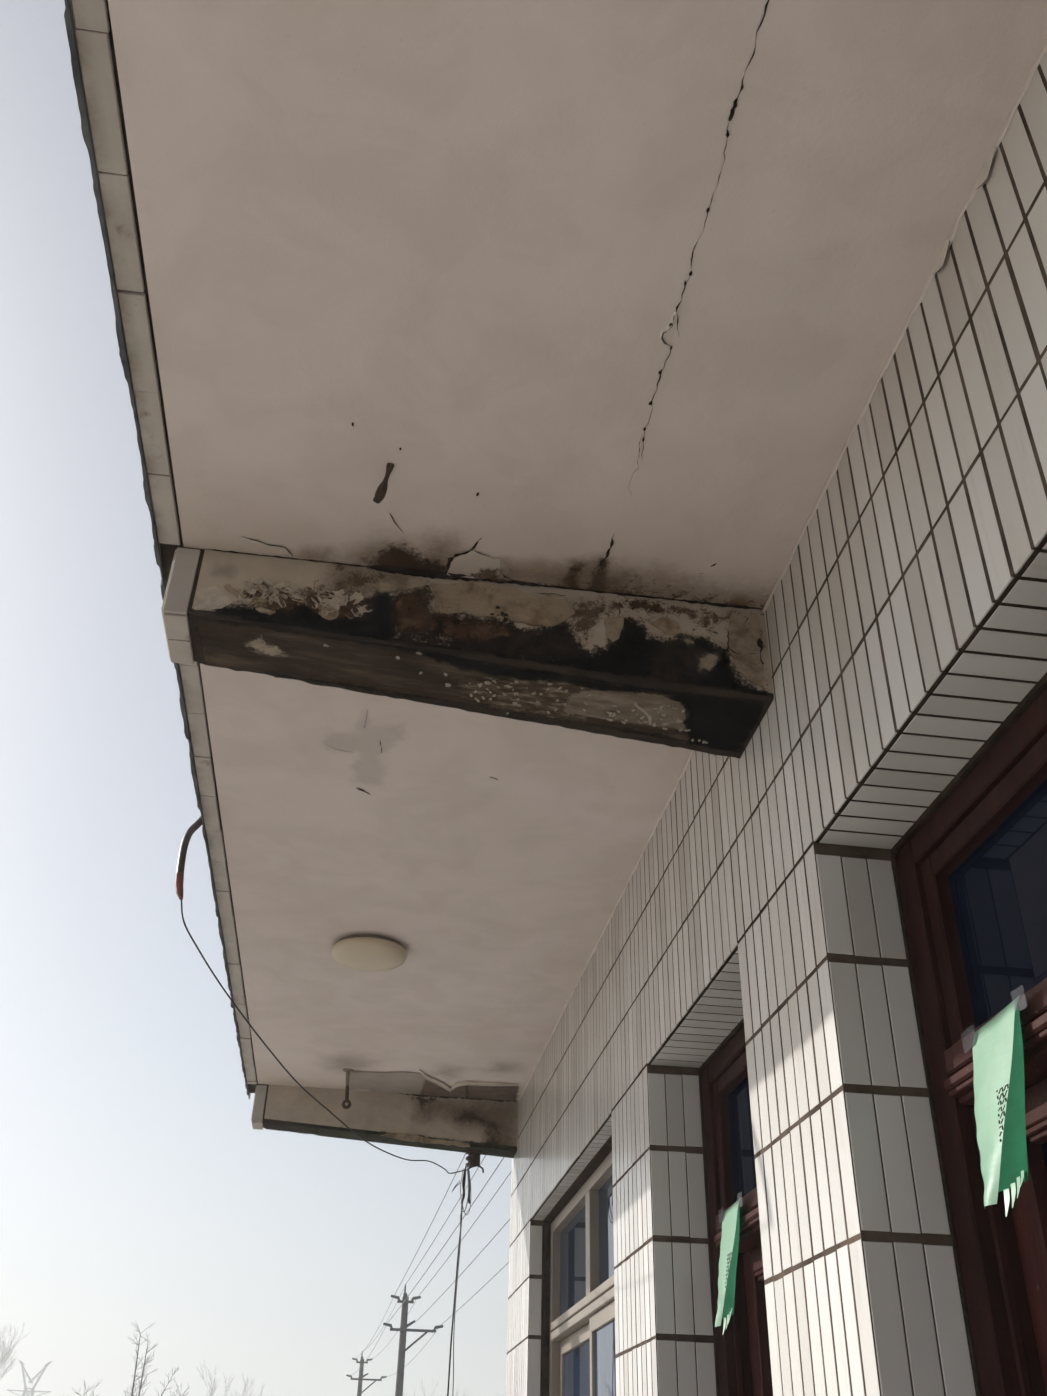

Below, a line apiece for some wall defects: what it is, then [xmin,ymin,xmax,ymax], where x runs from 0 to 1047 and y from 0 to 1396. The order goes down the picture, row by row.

crack [628,0,769,496]
peeling [194,538,581,628]
peeling [246,637,288,657]
water stain [194,546,767,752]
peeling [604,616,624,642]
peeling [680,613,765,688]
flaking render [444,673,708,744]
flaking render [349,1070,519,1101]
water stain [267,1096,517,1158]